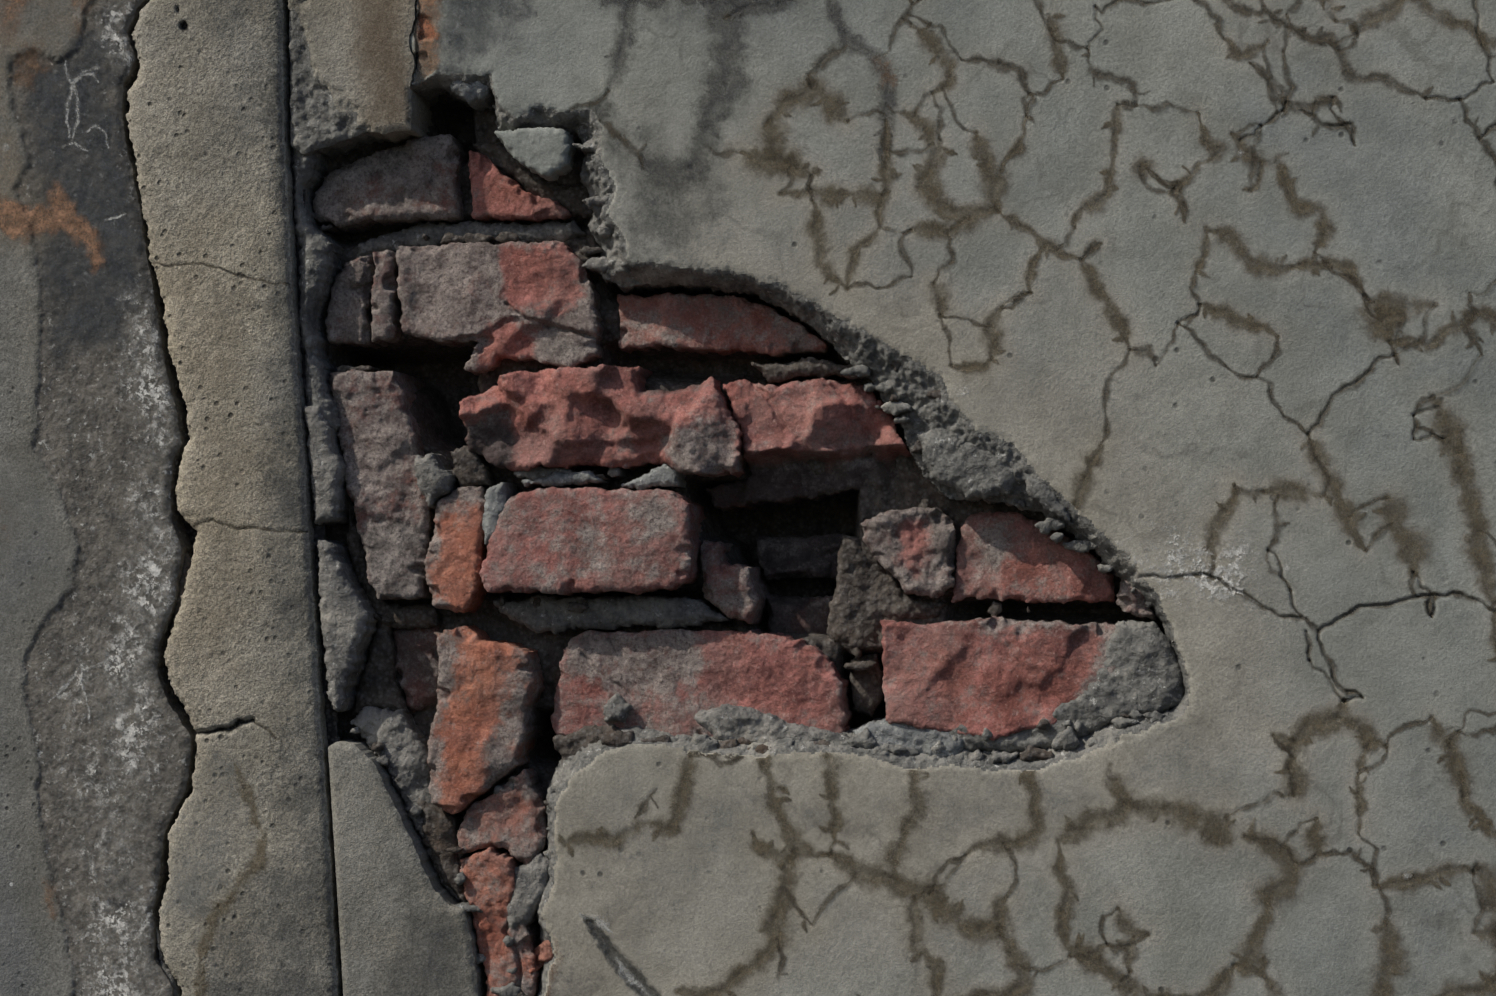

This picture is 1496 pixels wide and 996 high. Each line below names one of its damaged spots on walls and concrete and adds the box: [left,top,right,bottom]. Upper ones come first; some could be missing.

rust [416,0,440,78]
rust [0,184,103,272]
crack [152,262,290,285]
peeling [8,0,197,996]
spalling [289,8,1190,996]
crack [558,0,1496,996]
crack [166,515,308,739]
crack [156,927,182,996]